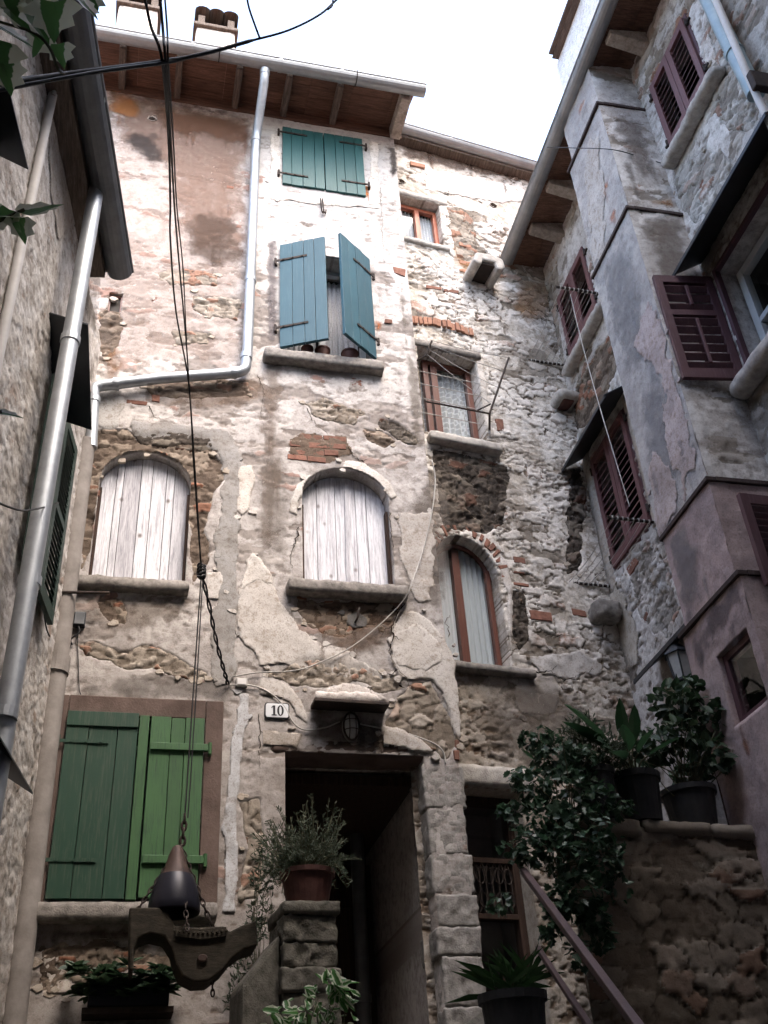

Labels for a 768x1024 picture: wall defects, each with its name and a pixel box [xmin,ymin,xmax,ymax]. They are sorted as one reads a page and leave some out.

water stain [118,99,249,242]
spalling [158,269,242,321]
spalling [99,296,127,361]
spalling [171,330,215,346]
flaking render [287,398,417,474]
spalling [81,429,230,585]
spalling [75,641,213,685]
spalling [291,596,402,646]
crack [381,603,418,698]